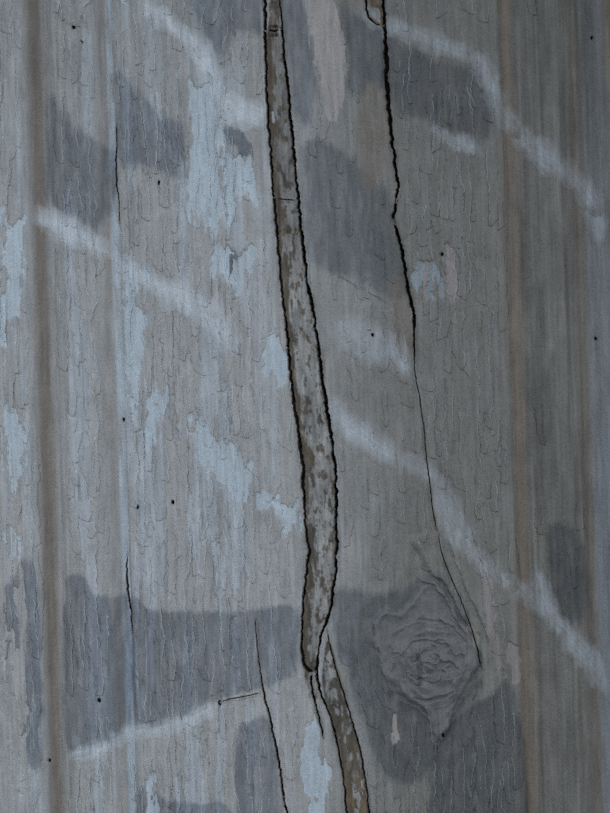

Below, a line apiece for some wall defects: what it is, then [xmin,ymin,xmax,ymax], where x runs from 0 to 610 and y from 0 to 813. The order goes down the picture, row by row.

peeling [305,0,349,122]
peeling [0,0,45,813]
peeling [110,0,302,813]
crack [260,0,373,813]
crack [362,0,483,668]
peeling [410,242,459,303]
crack [221,617,291,813]
peeling [282,707,333,813]
peeling [392,713,400,744]
peeling [466,578,521,685]